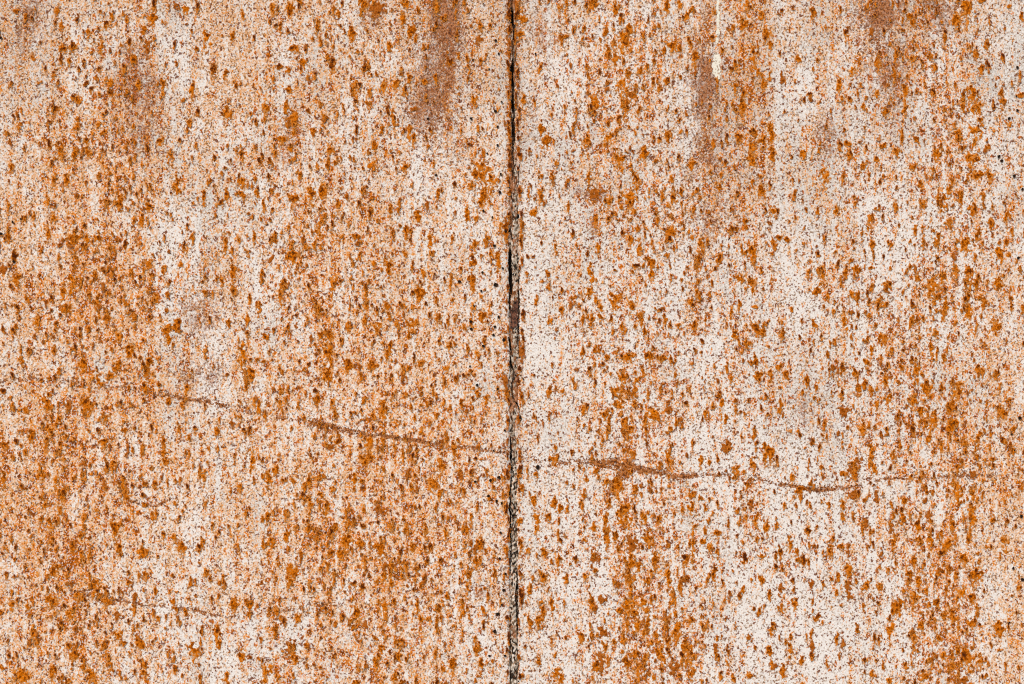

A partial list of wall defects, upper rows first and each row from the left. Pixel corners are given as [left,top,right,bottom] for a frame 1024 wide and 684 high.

corrosion [0,0,256,684]
corrosion [160,623,282,684]
crack [508,2,522,684]
corrosion [214,0,1024,684]